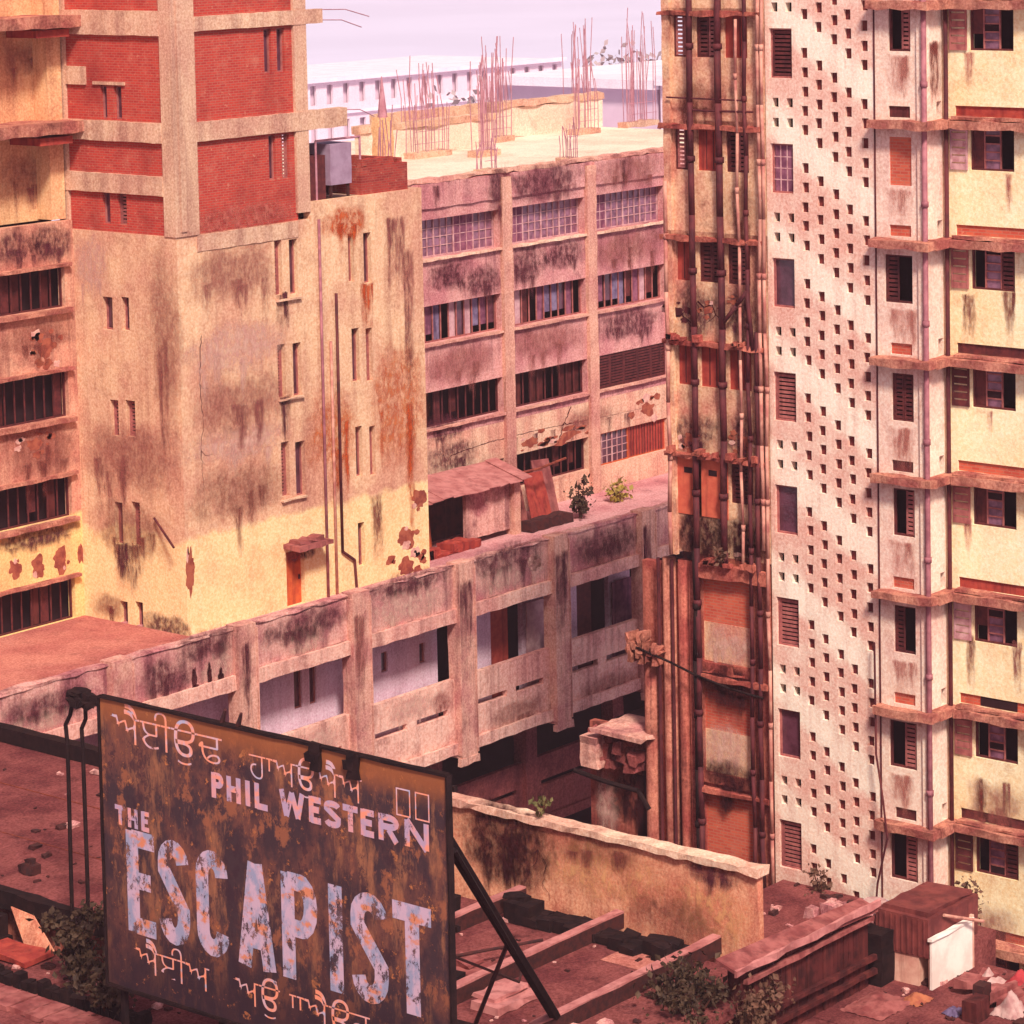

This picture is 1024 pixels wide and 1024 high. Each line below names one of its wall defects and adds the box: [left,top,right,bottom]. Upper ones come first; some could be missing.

corrosion [323,209,364,240]
damp [204,256,266,302]
damp [432,264,500,296]
corrosion [376,351,418,496]
peeling [521,425,589,451]
damp [94,432,164,495]
spalling [412,490,427,512]
spalling [9,544,83,580]
damp [106,513,155,578]
peeling [386,526,427,575]
spalling [588,724,646,774]
damp [467,796,740,940]